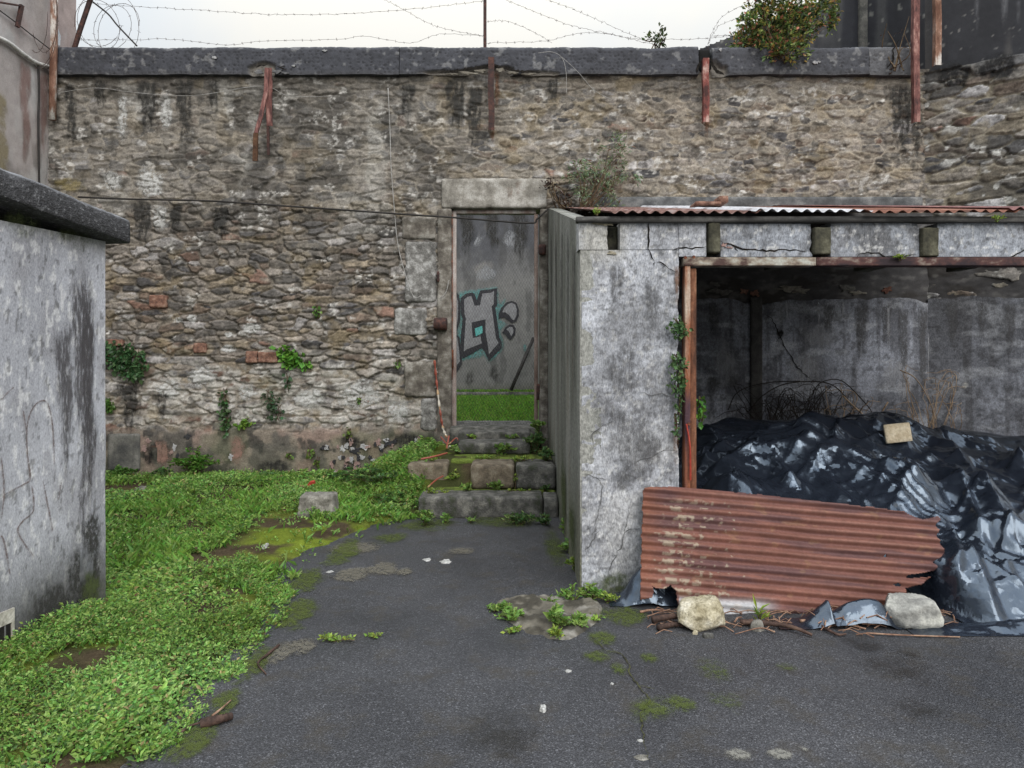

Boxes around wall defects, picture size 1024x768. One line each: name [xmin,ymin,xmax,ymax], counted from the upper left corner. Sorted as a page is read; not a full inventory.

water stain [65,84,76,141]
water stain [118,80,192,137]
efflorescence [105,172,121,190]
water stain [133,169,182,241]
water stain [214,207,230,237]
crack [648,223,811,272]
water stain [33,281,100,630]
crack [587,450,675,578]